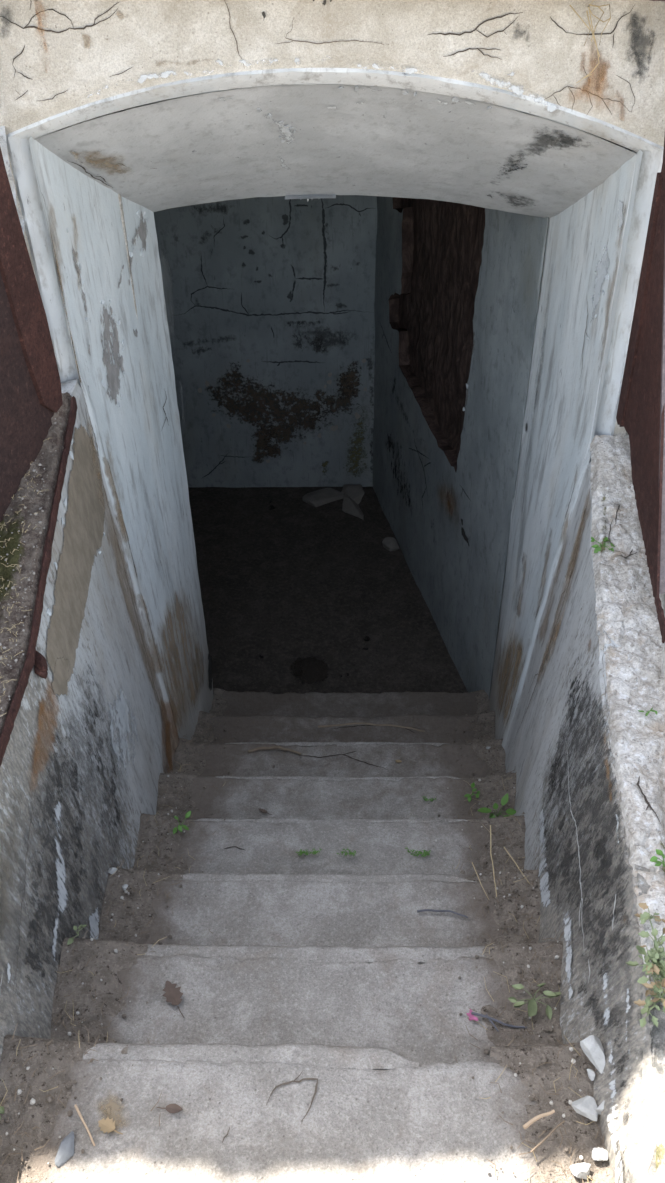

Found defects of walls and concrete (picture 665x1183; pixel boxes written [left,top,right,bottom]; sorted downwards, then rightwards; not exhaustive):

crack [0,0,119,101]
crack [428,6,634,60]
crack [538,67,635,115]
water stain [629,13,655,76]
water stain [504,131,579,174]
peeling [72,247,138,408]
peeling [118,210,150,286]
crack [173,198,392,366]
flaking render [198,358,367,463]
water stain [0,668,123,988]
water stain [538,657,665,1183]